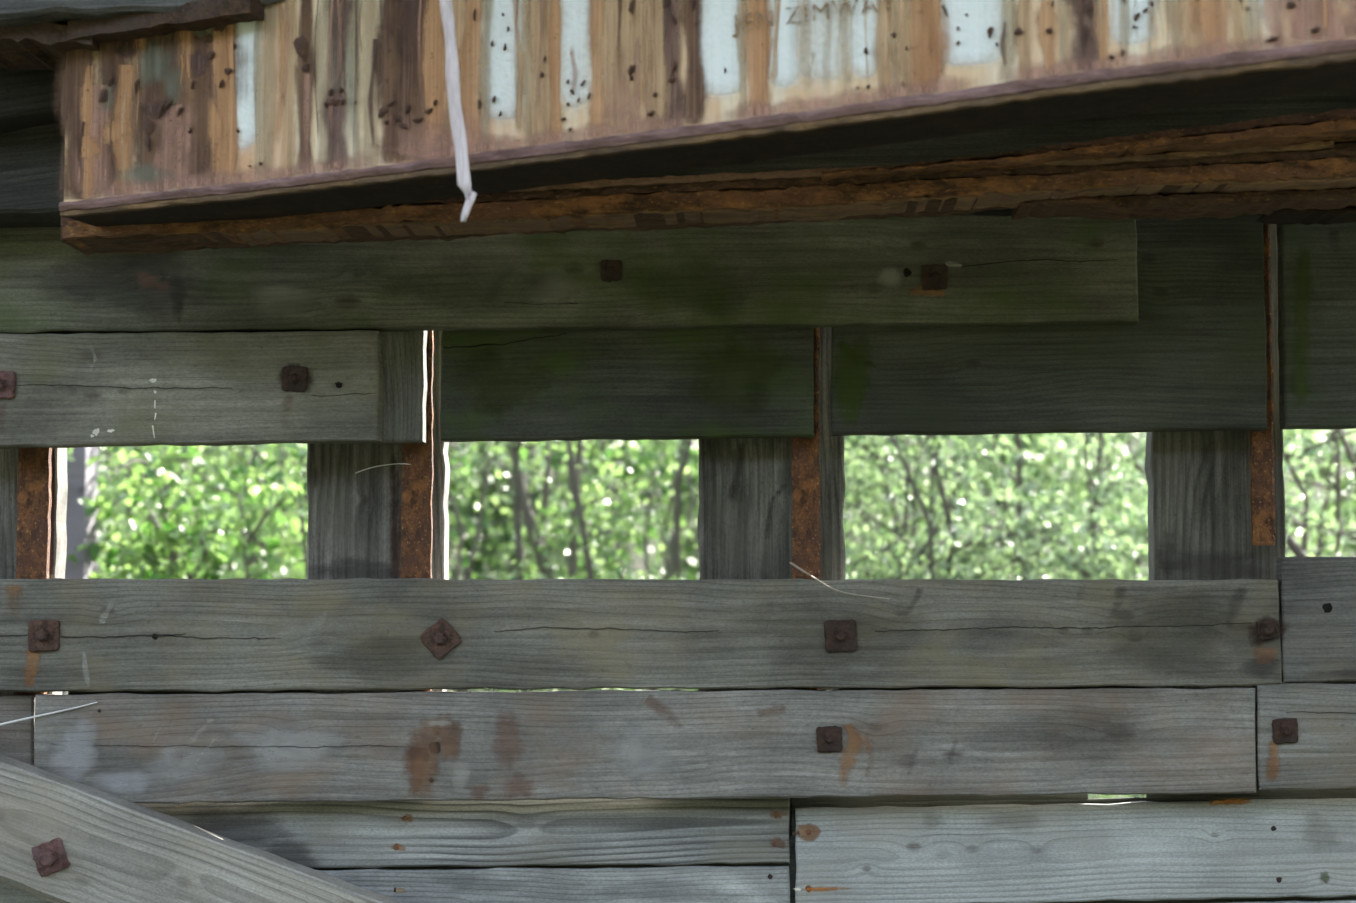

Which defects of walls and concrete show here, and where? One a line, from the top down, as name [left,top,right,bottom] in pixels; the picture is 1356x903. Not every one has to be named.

peeling [195,25,233,88]
peeling [561,79,591,131]
corrosion [406,718,459,792]